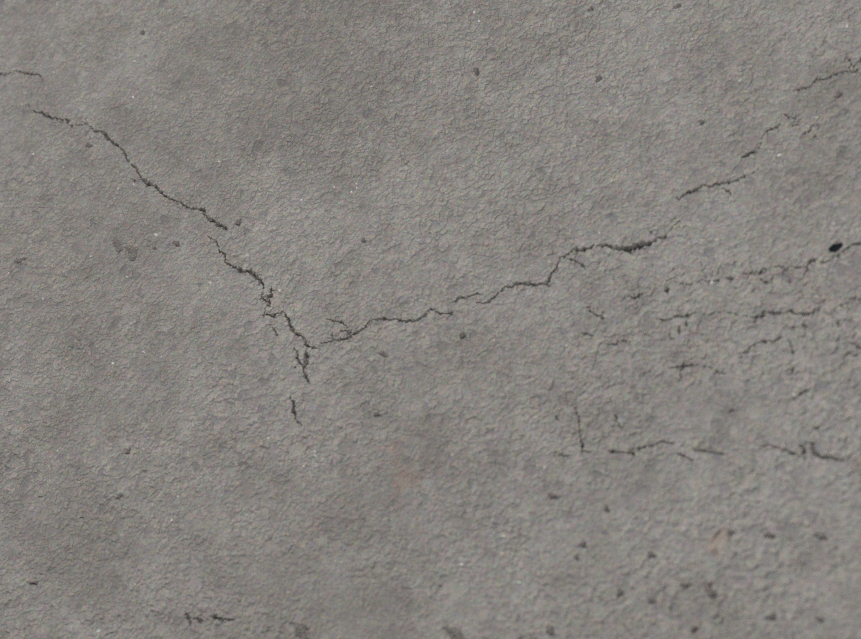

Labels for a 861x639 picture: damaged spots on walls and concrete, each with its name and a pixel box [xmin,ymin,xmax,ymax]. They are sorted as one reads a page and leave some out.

crack [0,70,43,81]
crack [792,56,861,91]
crack [26,104,817,384]
crack [664,242,861,293]
crack [656,296,861,378]
crack [289,396,303,425]